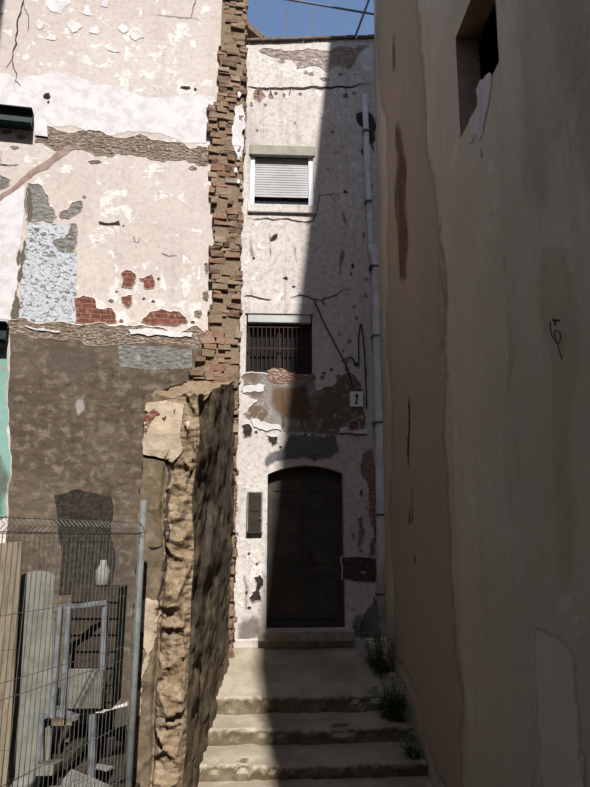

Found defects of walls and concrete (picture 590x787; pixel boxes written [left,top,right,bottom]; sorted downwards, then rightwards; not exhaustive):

crack [7,0,29,85]
crack [249,83,371,97]
flaking render [0,125,211,171]
flaking render [0,174,11,191]
flaking render [241,332,368,449]
flaking render [0,182,209,716]
flaking render [245,551,264,610]